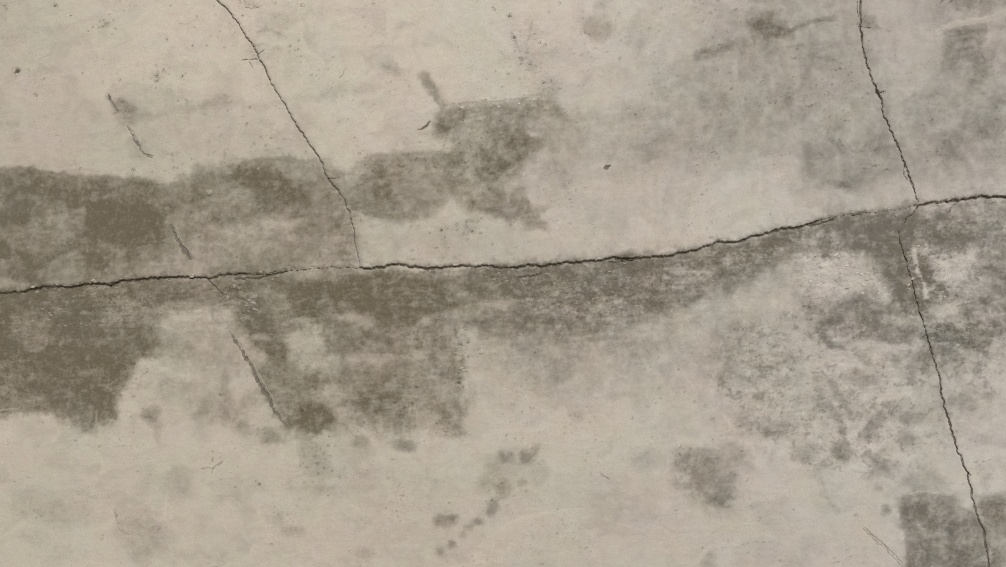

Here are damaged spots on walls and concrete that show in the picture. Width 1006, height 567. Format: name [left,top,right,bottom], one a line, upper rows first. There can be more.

leakage [112,94,236,162]
crack [217,0,855,278]
leakage [328,0,1006,236]
crack [2,271,287,294]
leakage [114,517,180,564]
leakage [431,442,542,558]
leakage [0,153,1006,484]
leakage [622,310,924,516]
crack [857,0,1006,566]
leakage [867,431,1006,567]